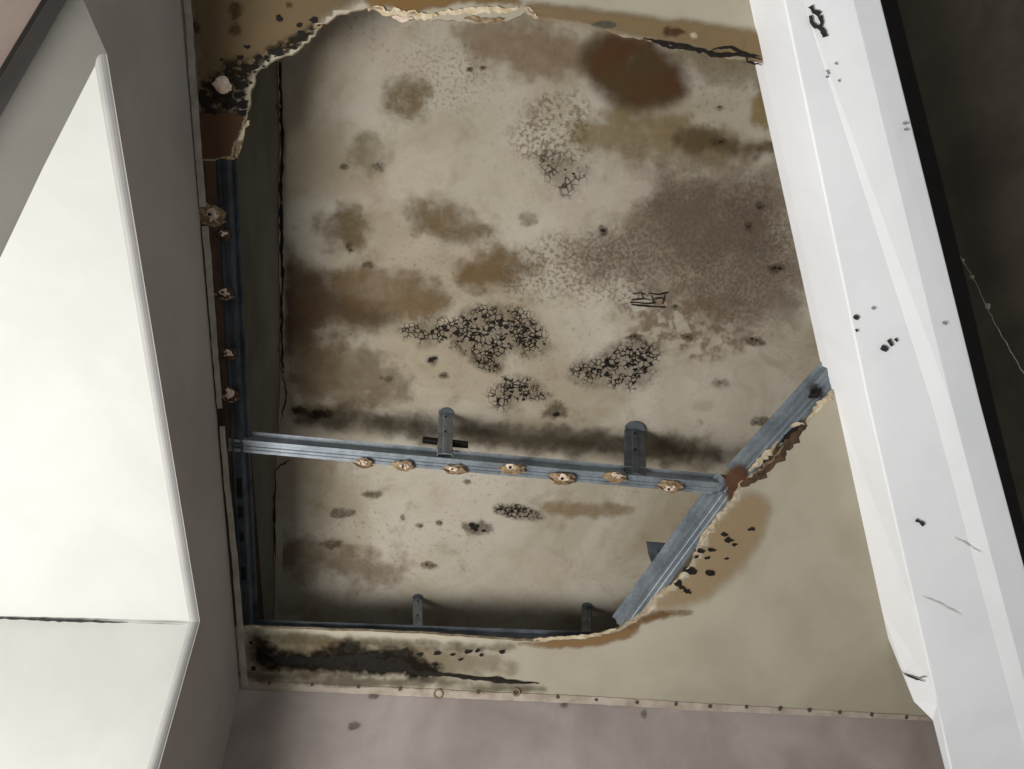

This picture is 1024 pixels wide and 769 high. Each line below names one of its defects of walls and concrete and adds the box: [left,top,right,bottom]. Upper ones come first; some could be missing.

crack [643,38,762,65]
peeling [809,15,828,37]
damp [191,0,774,162]
damp [285,259,565,418]
mould [571,291,764,389]
spalling [195,110,245,670]
damp [514,428,624,455]
peeling [748,422,804,472]
corrosion [724,465,748,501]
damp [523,497,767,649]
peeling [629,600,659,625]
damp [247,634,483,686]